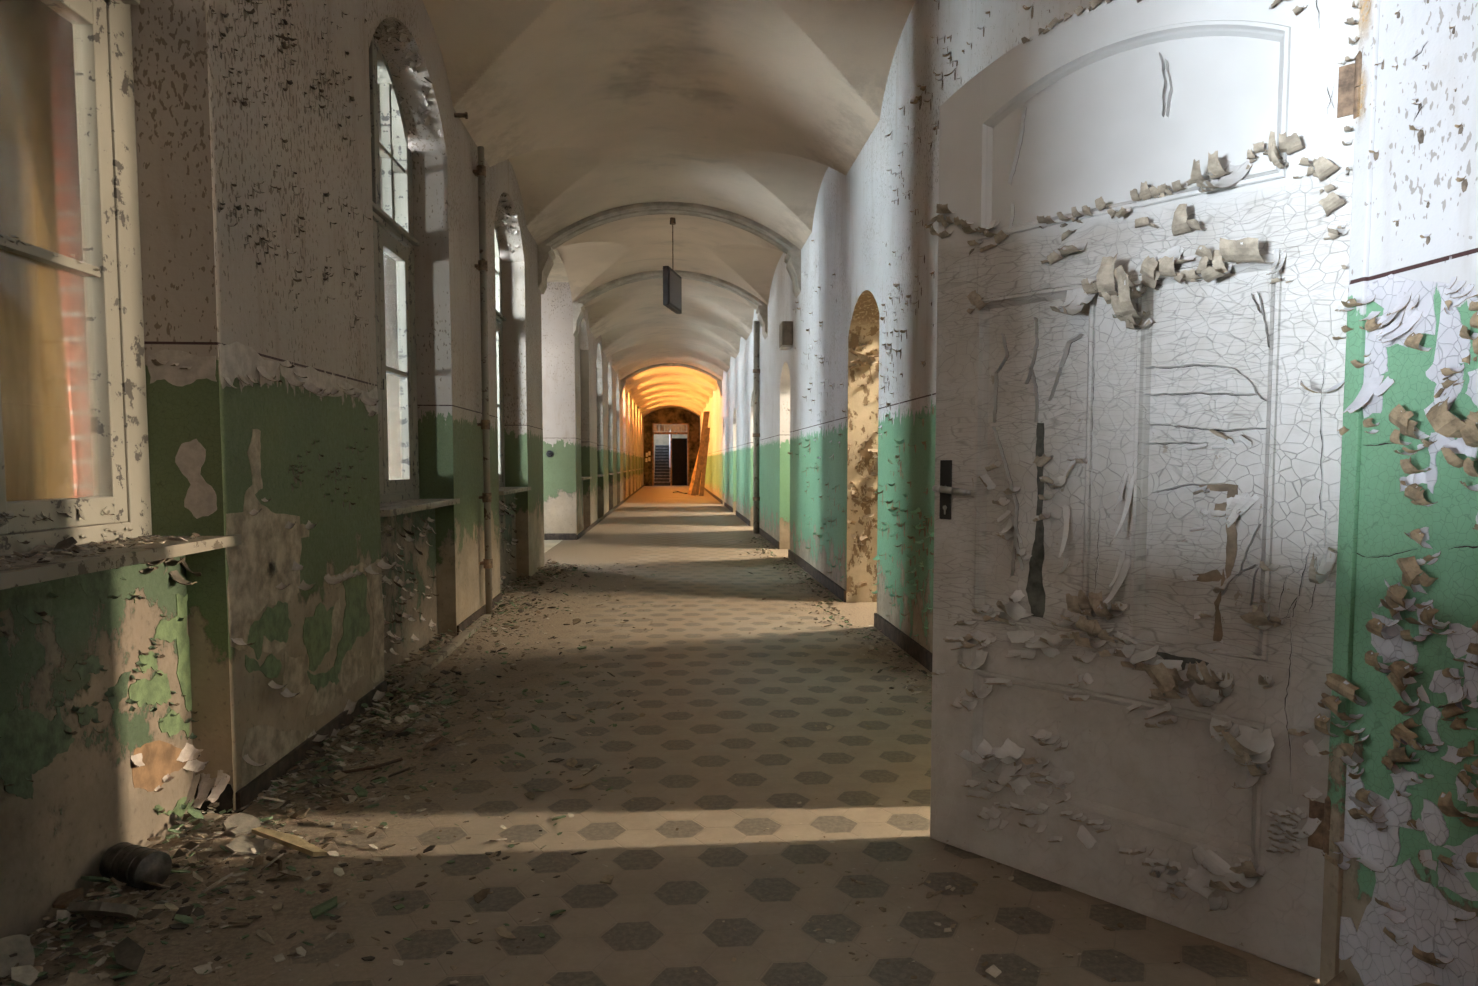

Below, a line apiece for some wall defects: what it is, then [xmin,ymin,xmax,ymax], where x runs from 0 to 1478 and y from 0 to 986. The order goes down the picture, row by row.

peeling [1338,0,1361,64]
peeling [0,507,133,547]
flaking render [65,429,439,821]
peeling [147,341,381,417]
peeling [209,0,441,331]
crack [991,317,1102,593]
peeling [788,241,1478,986]
crack [1151,483,1225,493]
peeling [1037,131,1351,330]
crack [1142,364,1270,445]
crack [1251,292,1270,348]
crack [1221,342,1478,793]